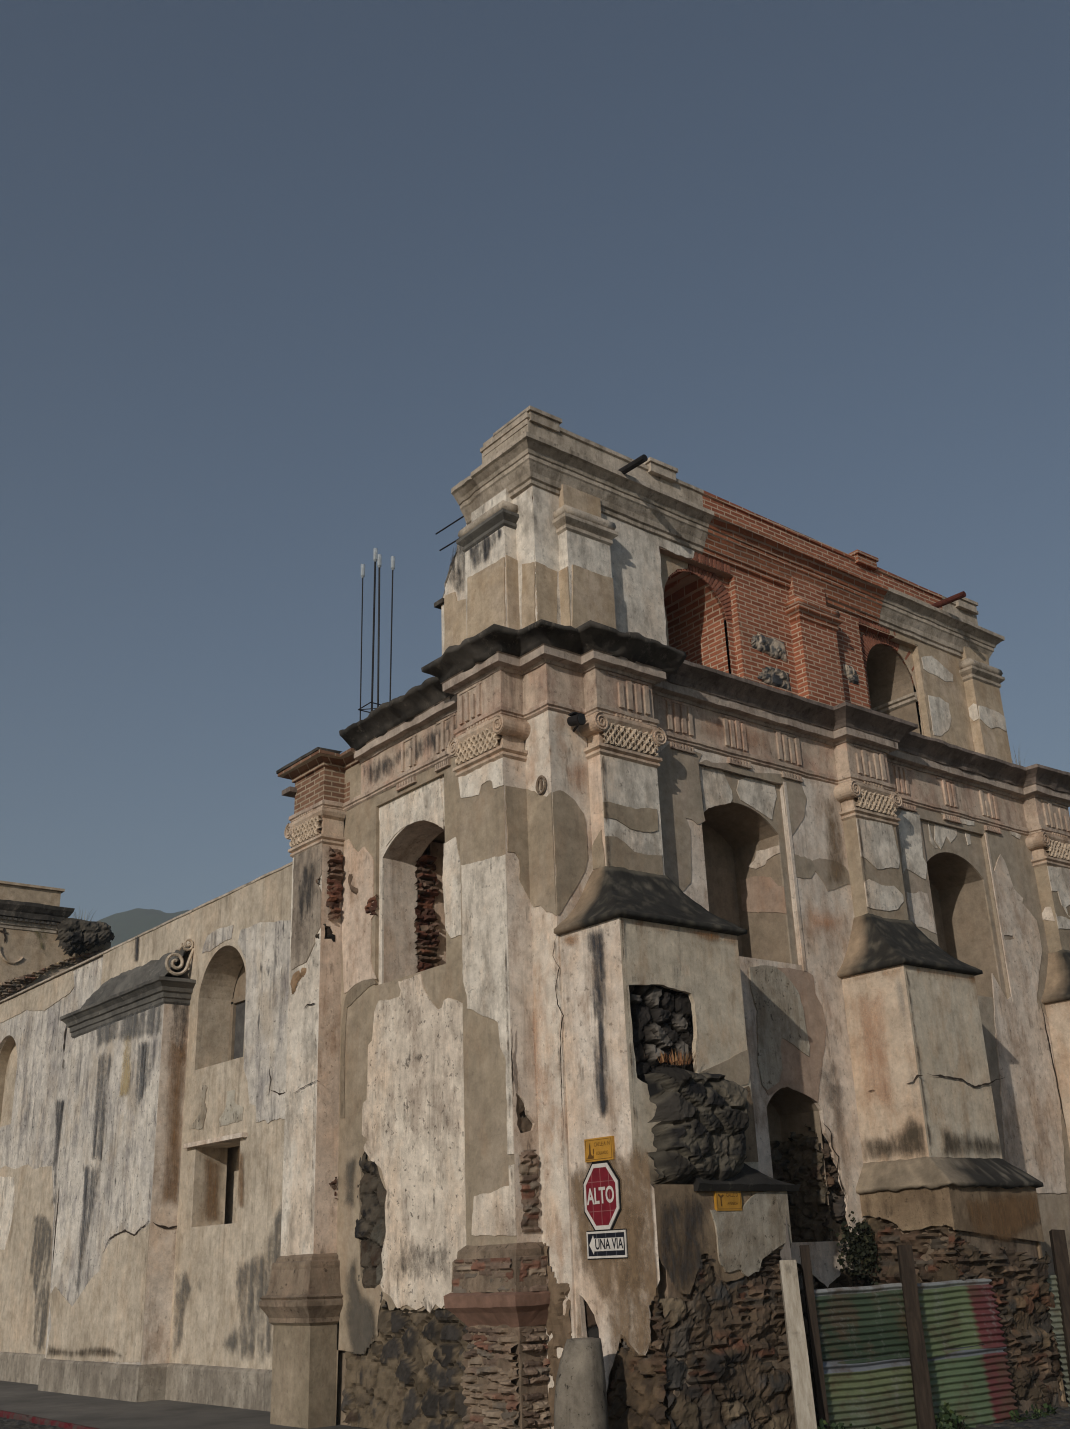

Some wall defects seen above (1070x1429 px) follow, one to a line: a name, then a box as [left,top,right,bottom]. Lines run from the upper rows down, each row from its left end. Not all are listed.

peeling [290,843,378,994]
leakage [51,1100,63,1203]
leakage [76,1001,188,1292]
spalling [509,1094,533,1133]
leakage [588,930,607,1116]
crack [907,1074,1005,1088]
crack [1041,1005,1066,1126]
leakage [30,1218,113,1356]
spalling [511,1150,599,1427]